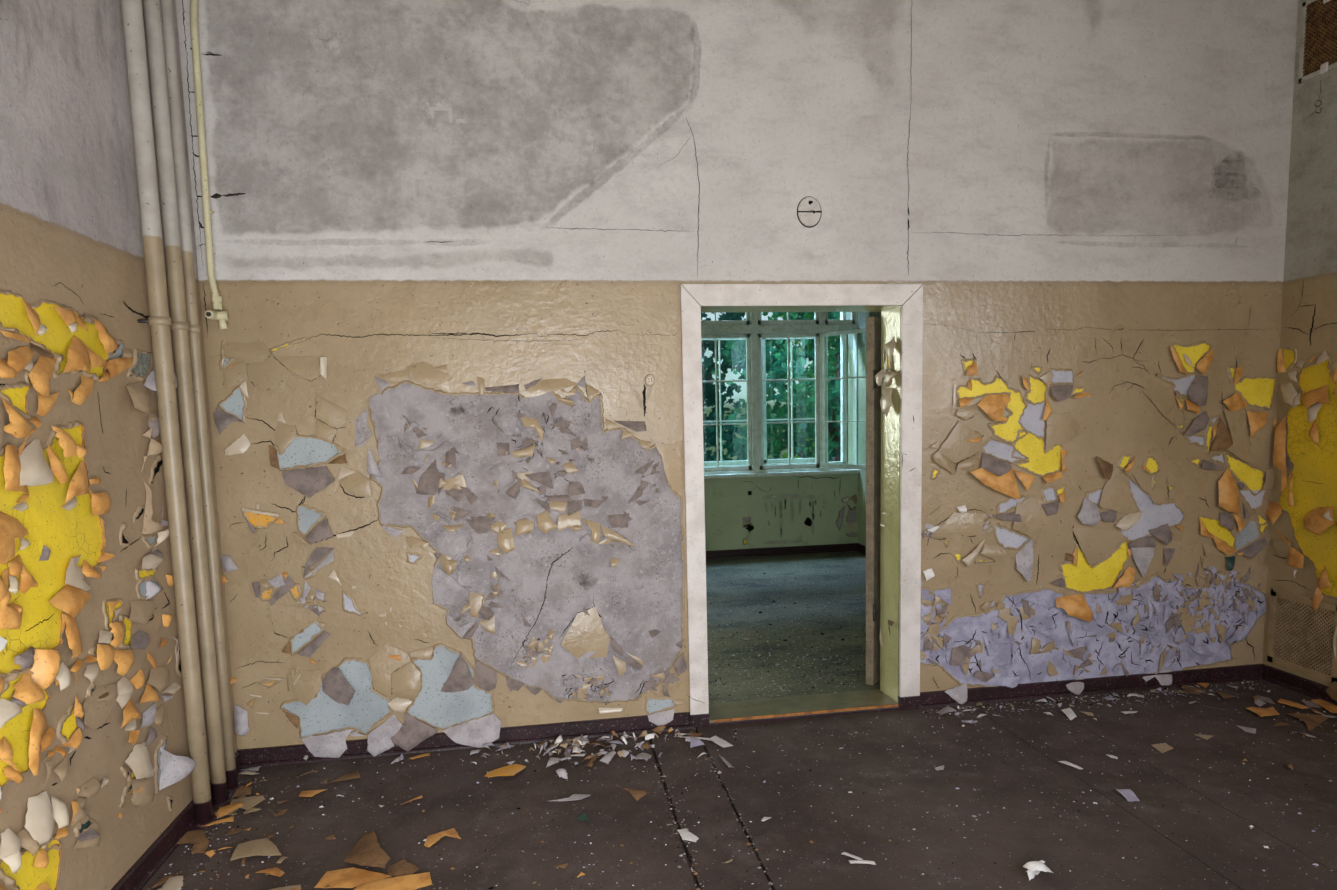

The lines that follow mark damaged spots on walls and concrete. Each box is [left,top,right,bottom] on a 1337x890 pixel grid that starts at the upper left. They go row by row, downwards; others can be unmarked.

crack [556,119,700,274]
crack [309,330,675,342]
peeling [0,289,197,890]
peeling [213,338,687,760]
peeling [920,340,1337,734]
peeling [600,750,616,764]
peeling [684,735,733,748]